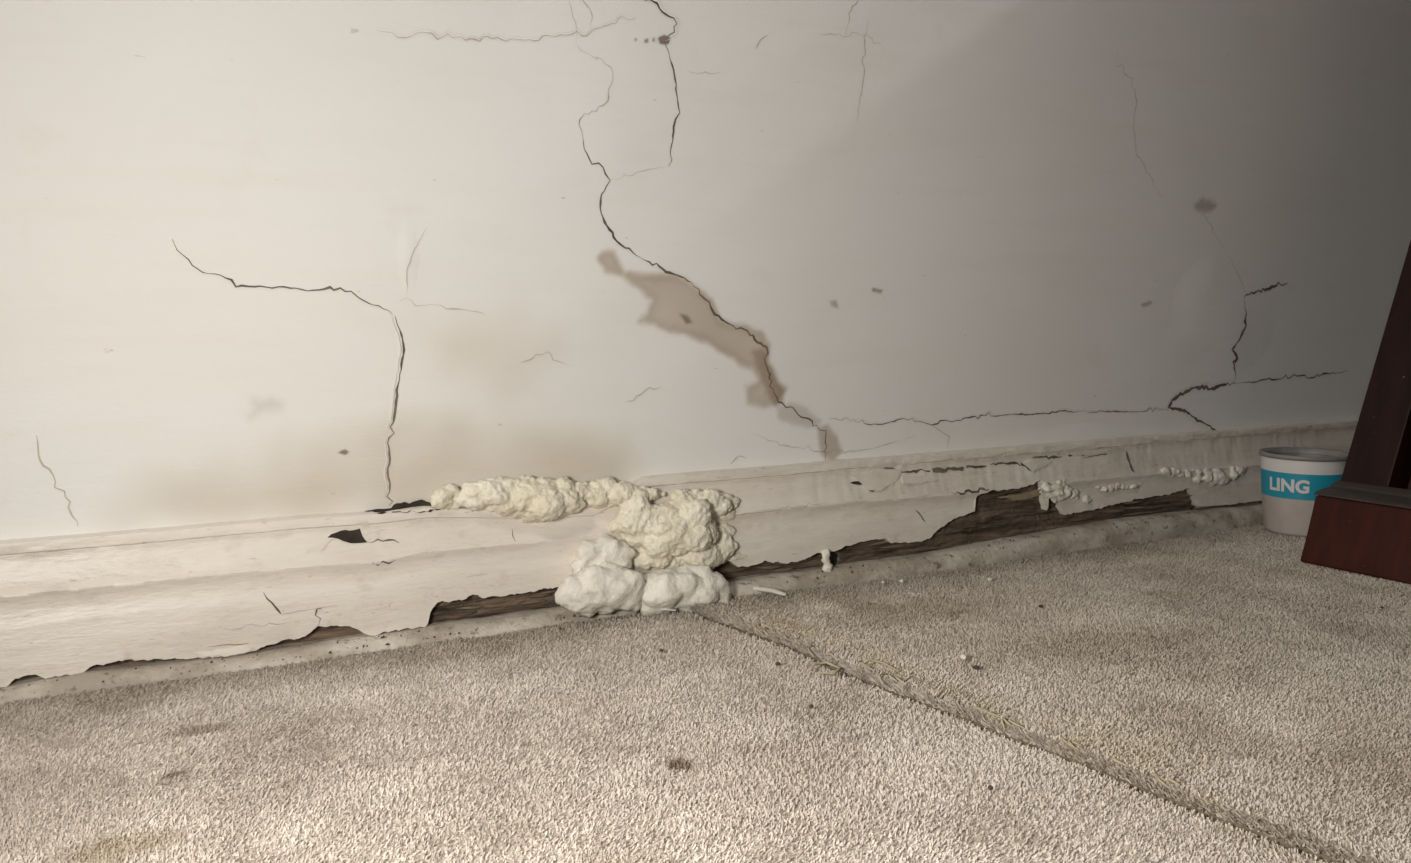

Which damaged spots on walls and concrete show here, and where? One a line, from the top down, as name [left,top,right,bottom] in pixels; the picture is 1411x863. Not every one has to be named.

crack [172,229,484,506]
crack [380,0,1344,495]
peeling [196,643,253,657]